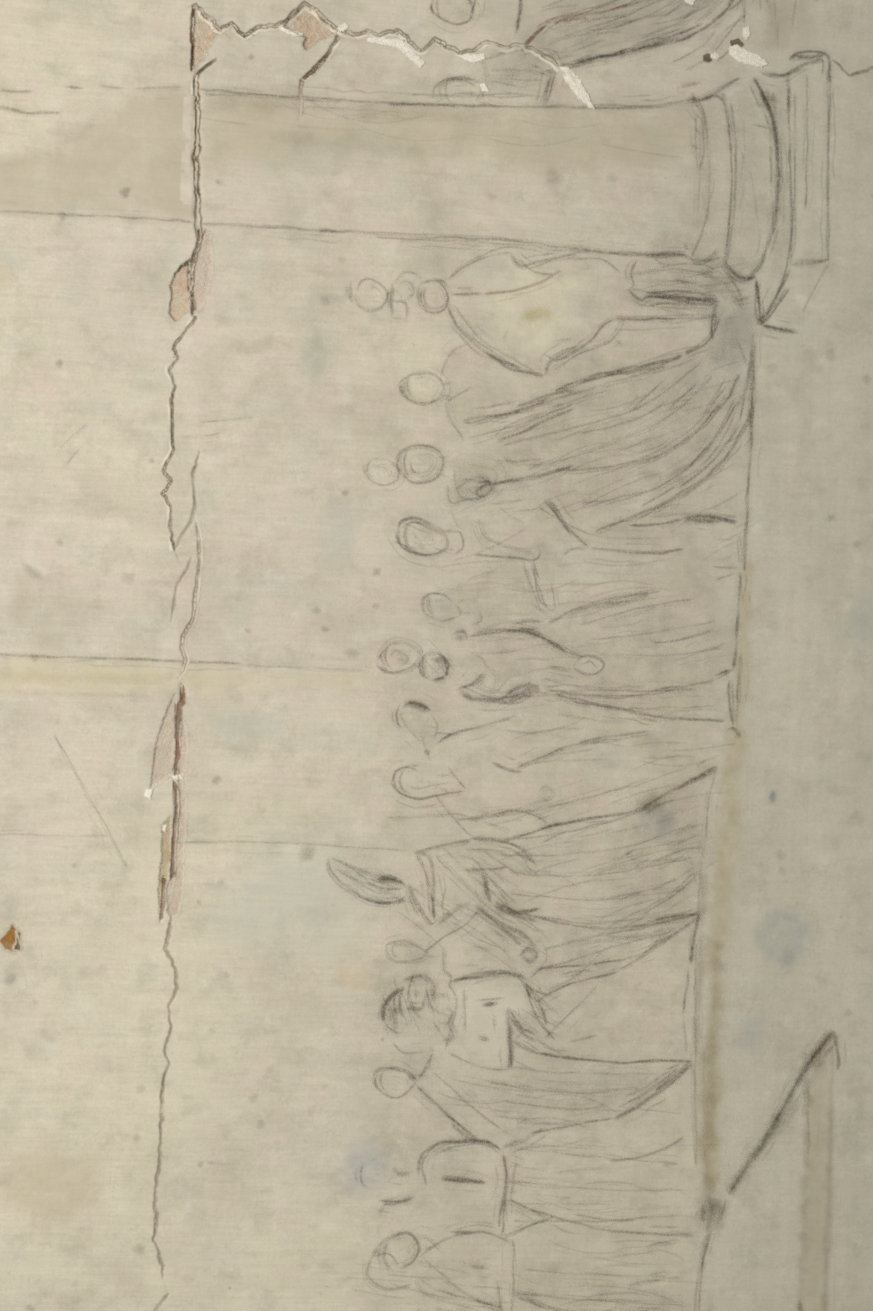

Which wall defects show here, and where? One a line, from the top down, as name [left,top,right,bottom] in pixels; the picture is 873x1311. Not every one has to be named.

spalling [190,7,221,72]
spalling [283,3,337,51]
spalling [703,26,768,68]
spalling [167,228,214,322]
crack [144,5,595,909]
spalling [149,692,190,919]
corrosion [0,889,42,997]